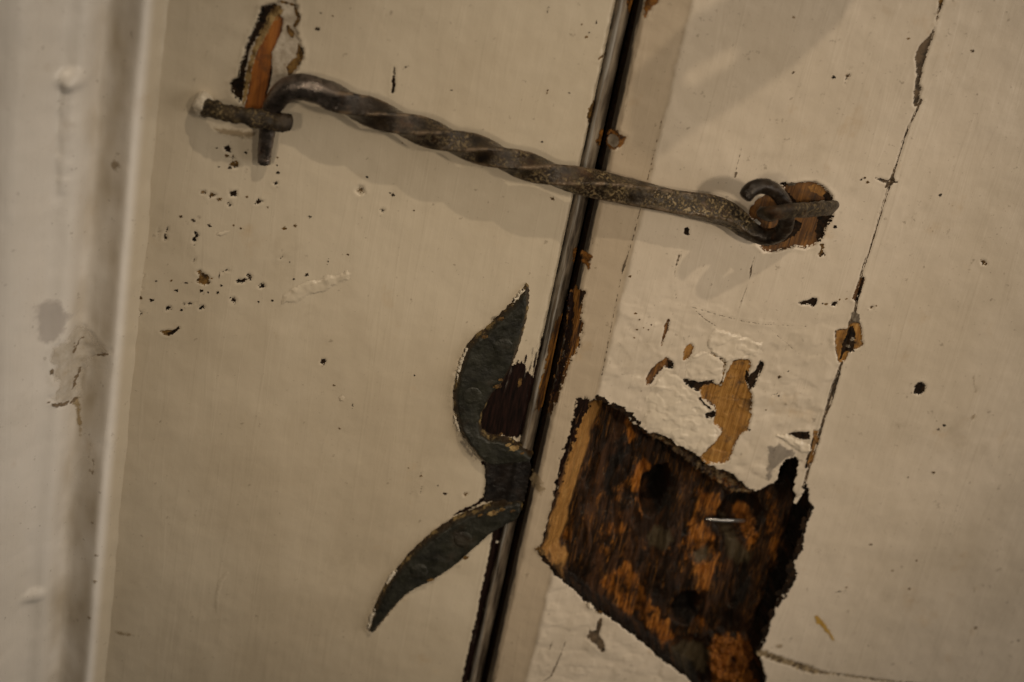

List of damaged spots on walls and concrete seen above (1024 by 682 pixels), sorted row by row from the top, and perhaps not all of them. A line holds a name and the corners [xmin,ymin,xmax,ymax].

peeling [230,0,304,109]
peeling [758,215,837,257]
peeling [781,181,833,203]
crack [848,99,922,326]
peeling [166,259,236,311]
peeling [535,284,586,416]
peeling [634,312,694,385]
peeling [798,277,877,363]
peeling [683,355,764,464]
peeling [789,430,820,468]
crack [803,361,843,485]
peeling [587,618,605,652]